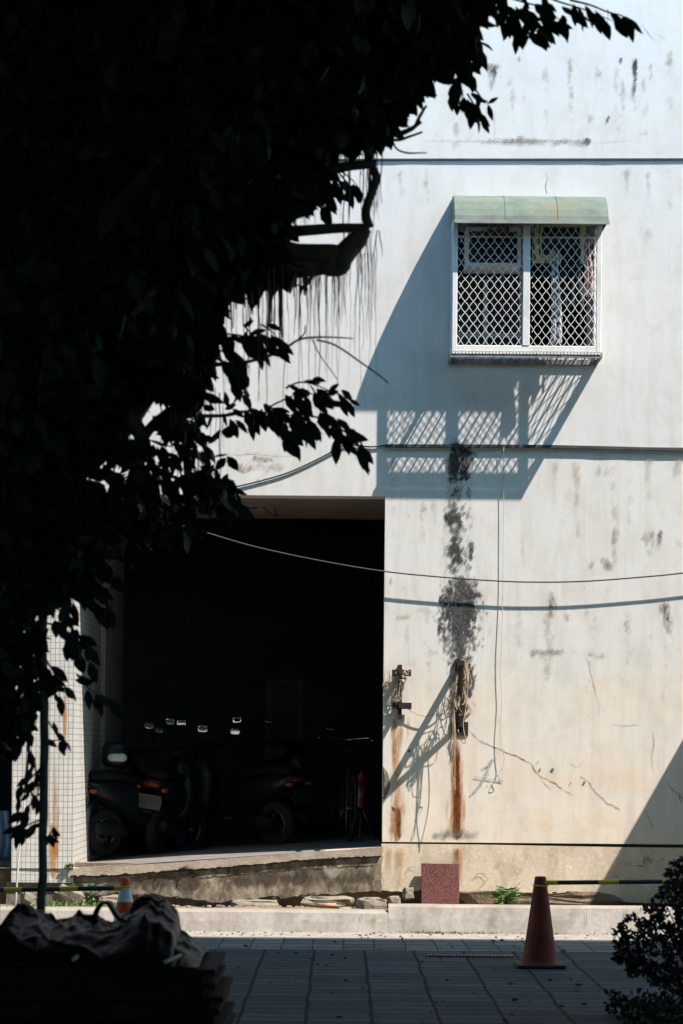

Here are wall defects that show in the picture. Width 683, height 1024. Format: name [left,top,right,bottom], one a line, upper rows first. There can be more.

damp [437,439,488,718]
corrosion [50,820,58,877]
corrosion [390,722,403,863]
corrosion [452,745,466,875]
crack [471,732,619,809]